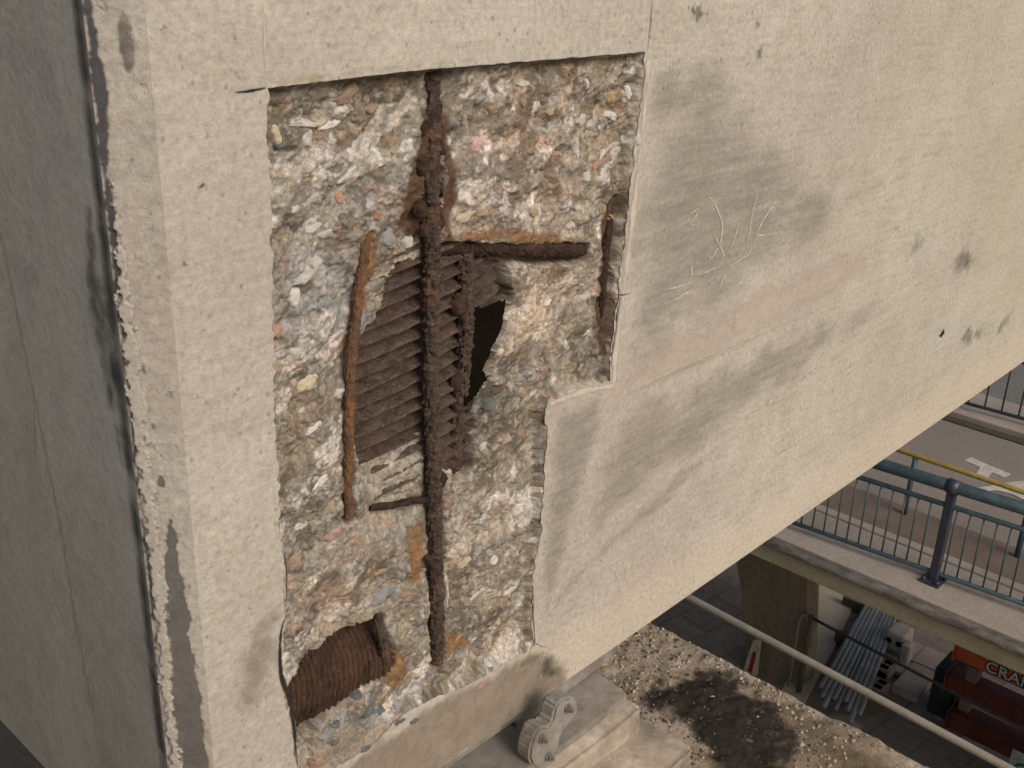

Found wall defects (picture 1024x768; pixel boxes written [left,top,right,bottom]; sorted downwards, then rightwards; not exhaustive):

corrosion [396,110,575,243]
corrosion [339,234,377,353]
corrosion [596,196,624,364]
water stain [74,0,165,754]
spalling [266,52,645,768]
corrosion [407,523,425,583]
corrosion [384,648,407,687]